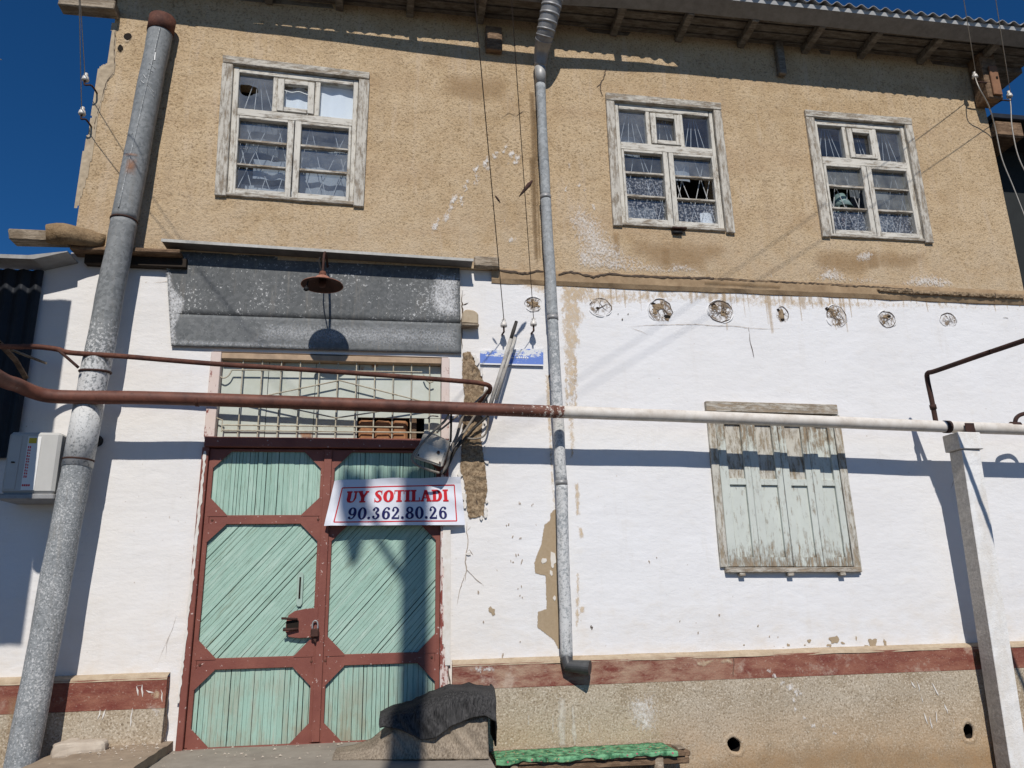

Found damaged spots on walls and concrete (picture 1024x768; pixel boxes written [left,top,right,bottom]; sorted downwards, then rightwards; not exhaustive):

flaking render [74,23,132,208]
damp [573,211,654,270]
flaking render [457,351,489,520]
peeling [510,509,560,649]
peeling [827,636,887,647]